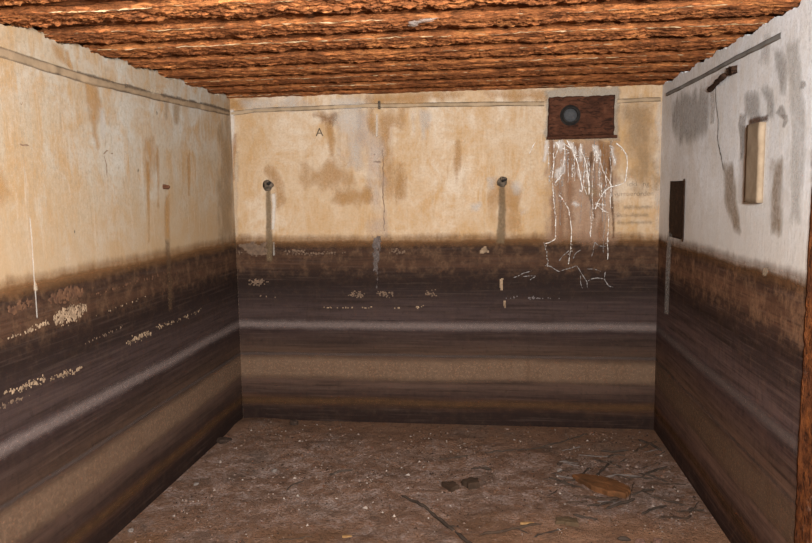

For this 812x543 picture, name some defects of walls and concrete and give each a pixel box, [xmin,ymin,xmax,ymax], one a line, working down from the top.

water stain [0,110,807,543]